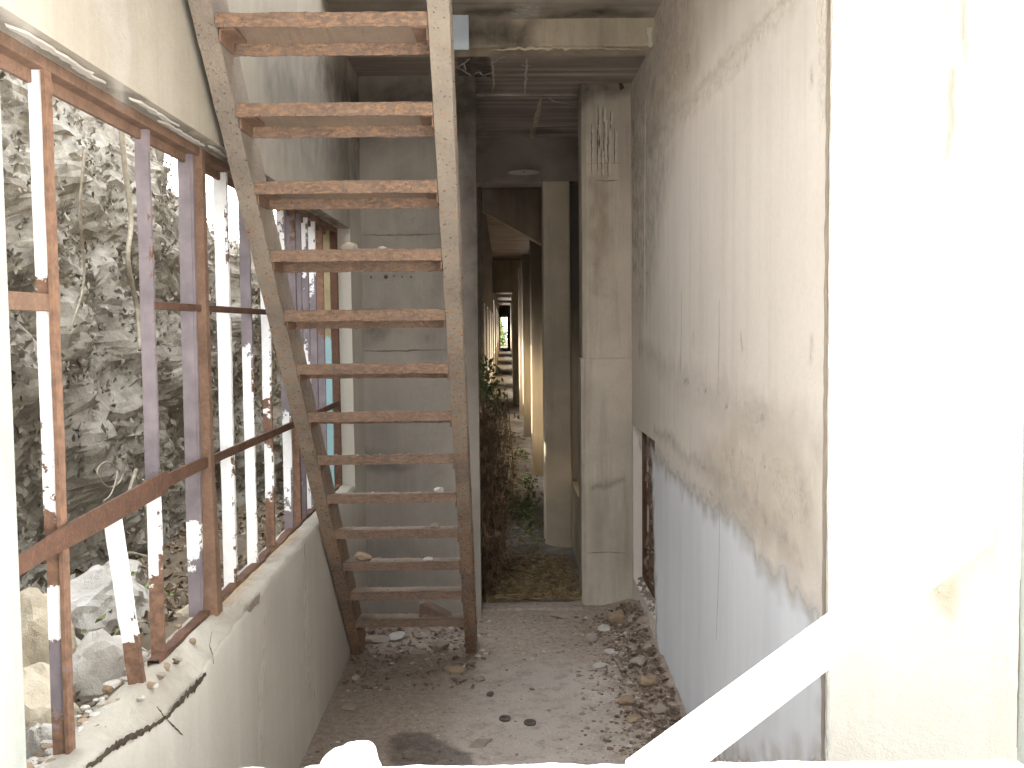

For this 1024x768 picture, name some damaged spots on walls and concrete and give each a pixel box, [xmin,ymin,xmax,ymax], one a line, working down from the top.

crack [86,631,214,768]